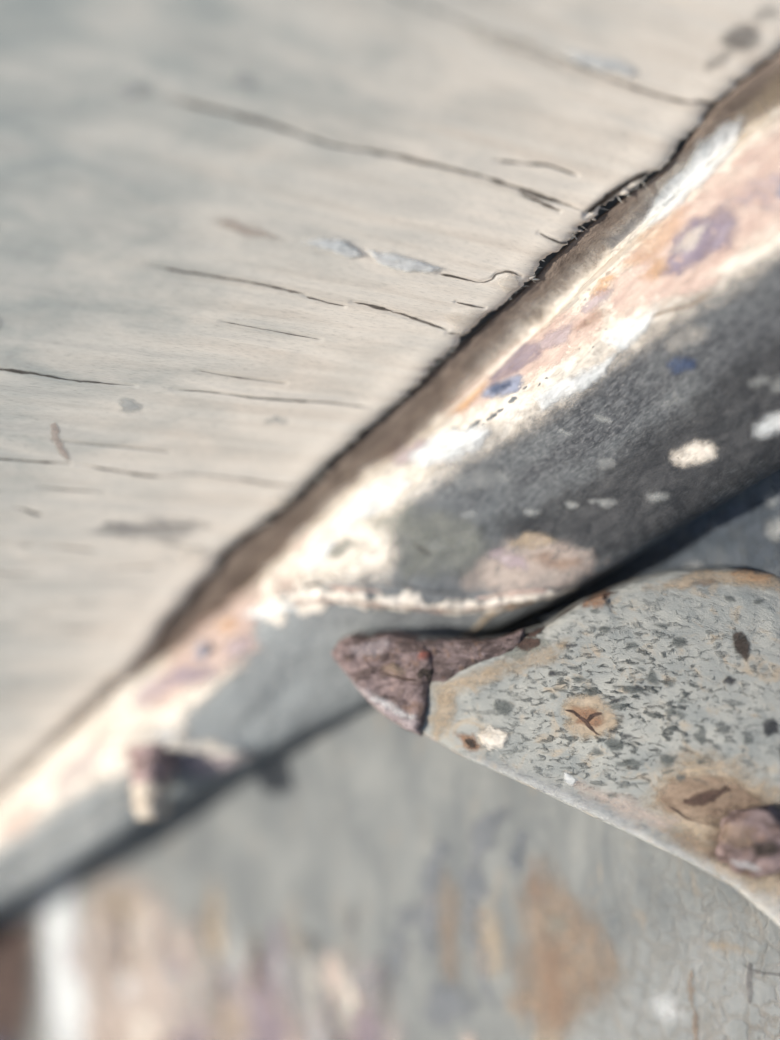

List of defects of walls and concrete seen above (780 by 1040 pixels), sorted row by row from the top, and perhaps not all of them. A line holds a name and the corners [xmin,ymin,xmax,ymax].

crack [177,99,649,212]
crack [0,369,116,385]
crack [182,372,367,408]
crack [155,266,517,334]
peeling [258,107,780,596]
corrosion [421,533,616,682]
spalling [733,632,750,660]
peeling [0,659,239,887]
corrosion [563,696,617,737]
corrosion [655,752,780,897]
spalling [763,719,779,736]
peeling [0,880,87,1040]